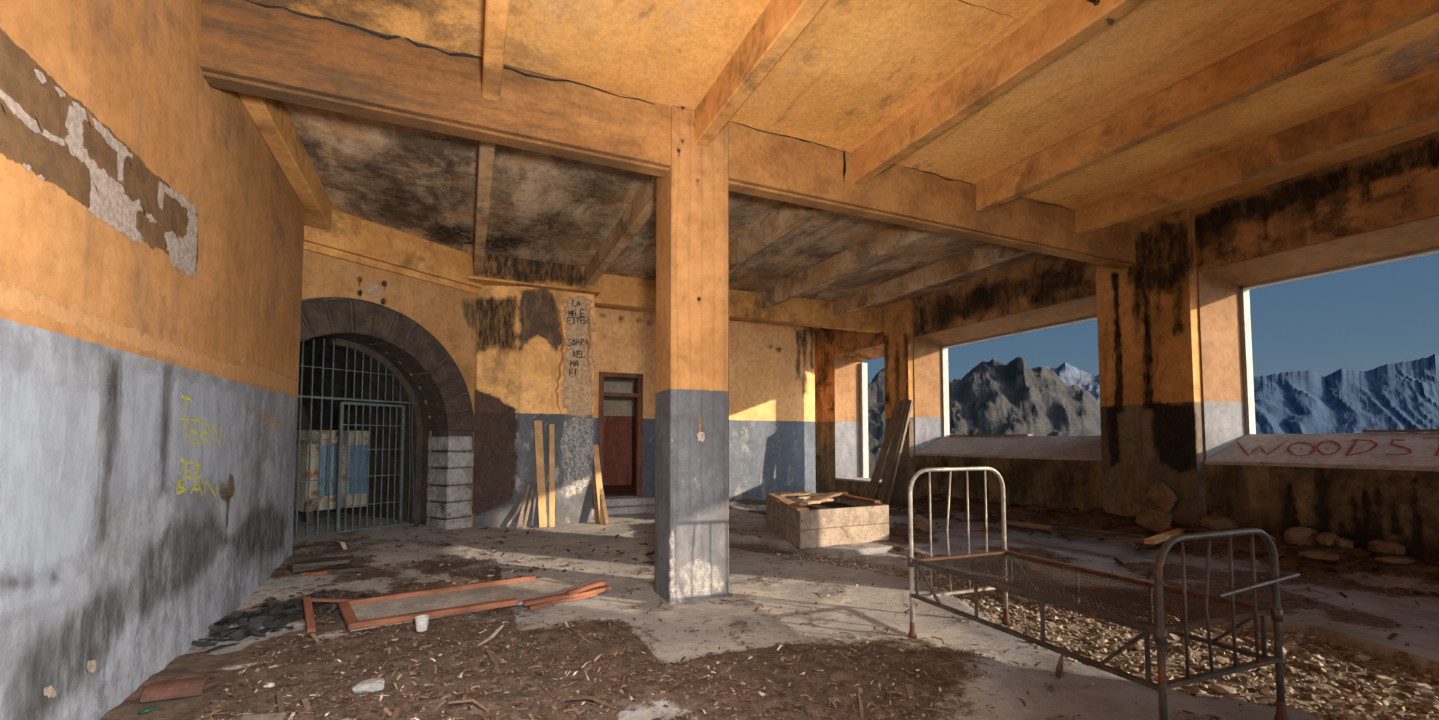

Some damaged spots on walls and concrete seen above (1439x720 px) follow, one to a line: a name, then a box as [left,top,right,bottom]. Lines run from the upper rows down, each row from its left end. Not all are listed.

crack [246,0,655,105]
peeling [0,69,198,278]
water stain [339,148,586,350]
peeling [554,296,595,497]
crack [731,121,846,182]
crack [912,168,970,184]
water stain [883,263,1084,404]
water stain [1106,272,1124,466]
water stain [1143,286,1198,473]
water stain [1195,139,1439,265]
water stain [1206,470,1439,560]
water stain [27,506,284,720]